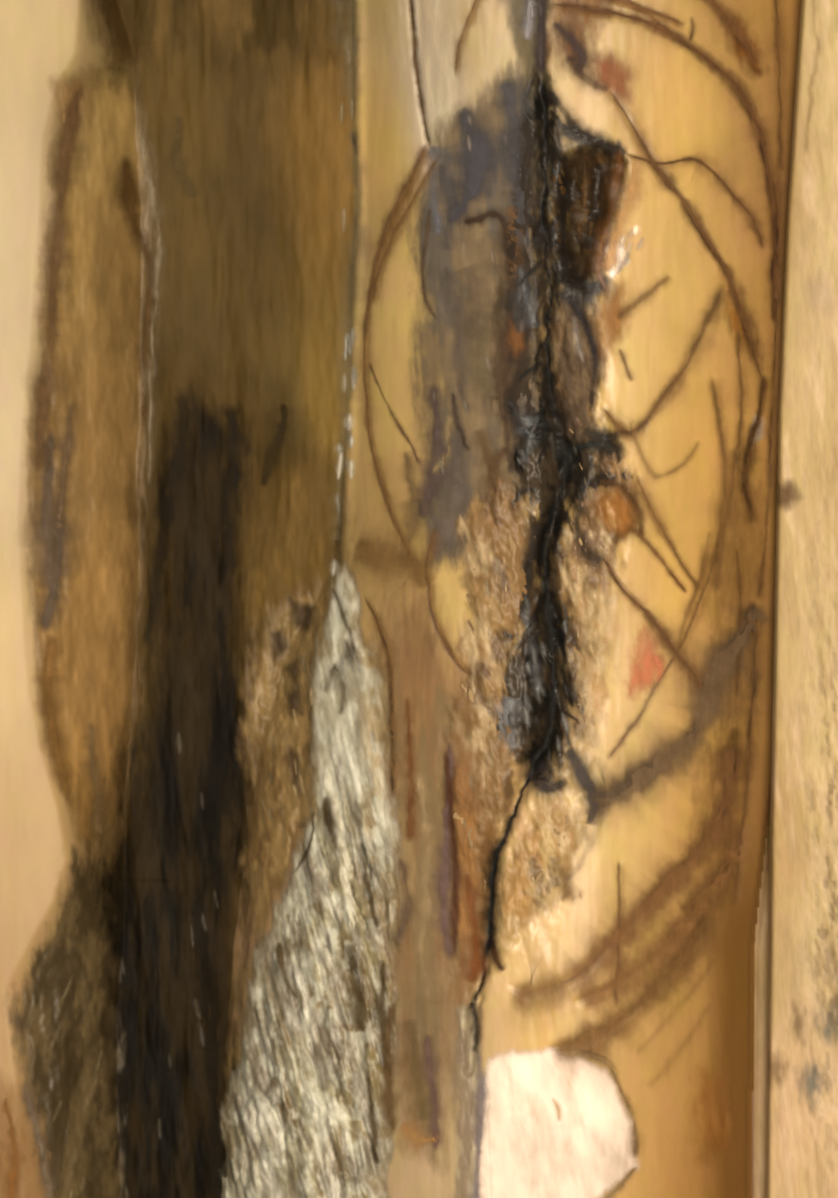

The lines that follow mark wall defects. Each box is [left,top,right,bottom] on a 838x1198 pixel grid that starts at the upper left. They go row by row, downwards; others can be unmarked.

water stain [102,0,339,67]
peeling [341,0,356,118]
crack [455,0,477,70]
corrosion [555,0,629,97]
water stain [14,386,342,1198]
spalling [221,495,405,1198]
peeling [338,416,353,477]
water stain [402,0,632,776]
spalling [446,479,589,941]
spalling [558,341,643,744]
crack [471,0,784,1056]
peeling [454,1006,638,1198]